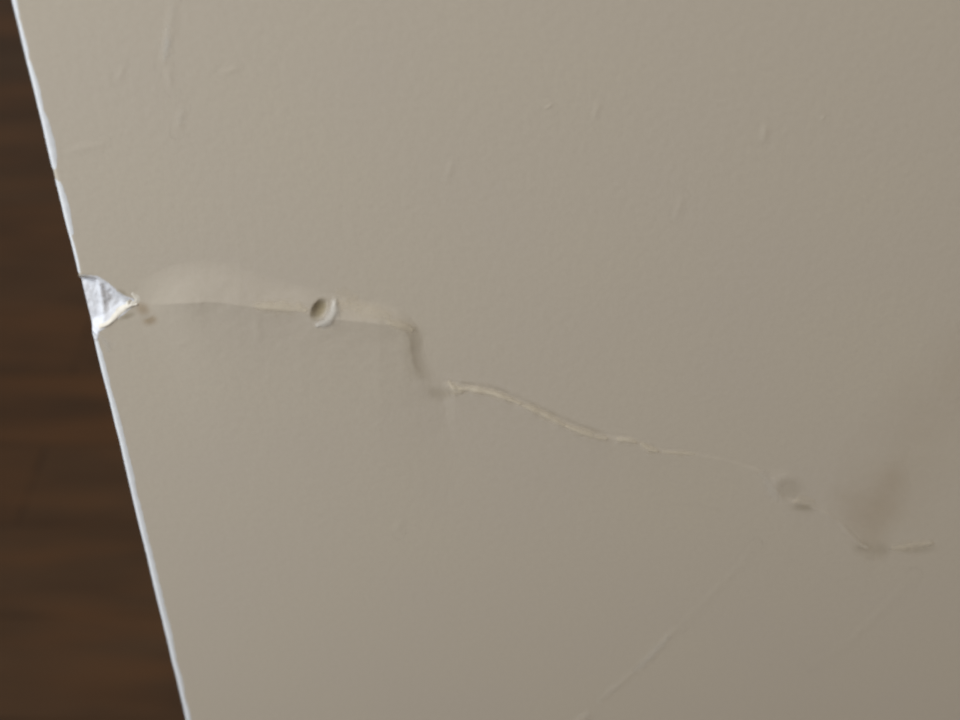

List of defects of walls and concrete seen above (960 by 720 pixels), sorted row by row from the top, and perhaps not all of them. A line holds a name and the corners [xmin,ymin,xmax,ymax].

peeling [12,0,191,720]